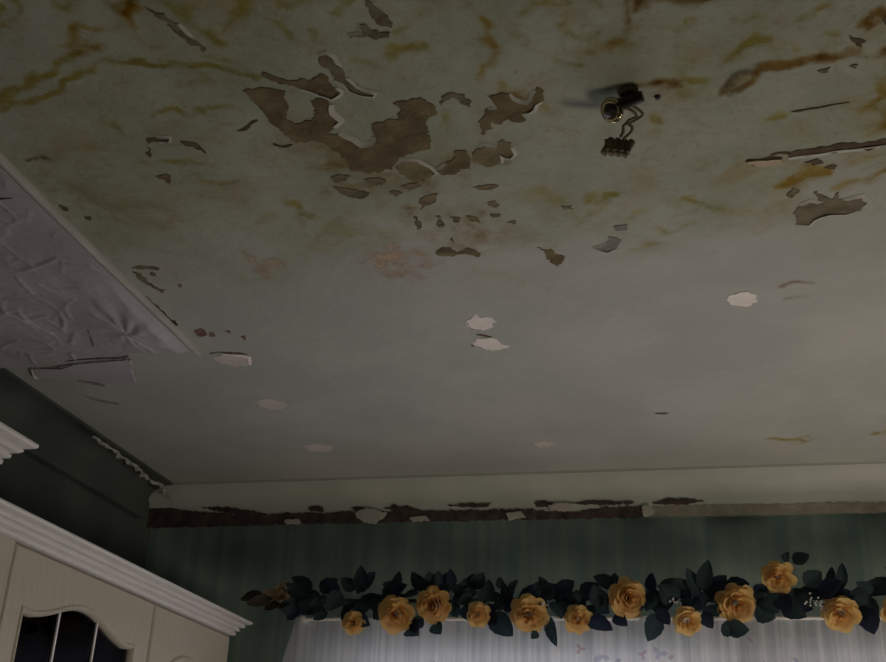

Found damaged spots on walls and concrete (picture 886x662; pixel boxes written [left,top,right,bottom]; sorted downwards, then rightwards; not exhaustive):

peeling [243,51,544,230]
crack [746,138,886,167]
peeling [786,187,872,227]
peeling [436,238,481,257]
peeling [537,247,565,267]
peeling [727,292,758,307]
peeling [464,314,509,351]
peeling [212,354,252,367]
peeling [147,498,886,529]